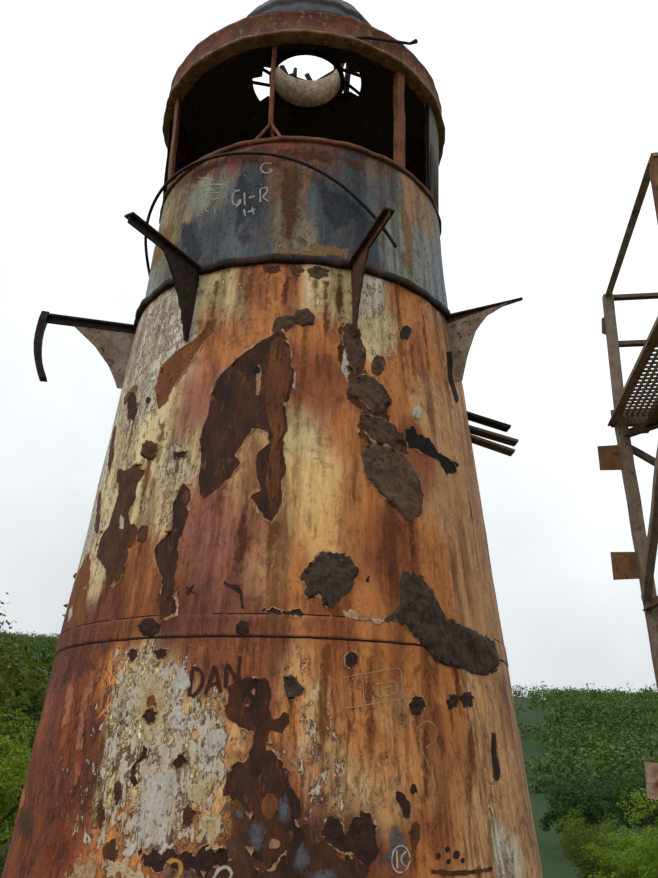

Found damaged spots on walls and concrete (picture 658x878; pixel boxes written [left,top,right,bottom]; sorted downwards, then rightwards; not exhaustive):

rust [191,147,350,258]
rust [397,200,419,268]
rust [323,274,343,332]
peeling [337,322,423,454]
peeling [153,318,296,621]
peeling [62,461,145,630]
rust [234,509,247,563]
peeling [135,647,196,743]
rust [318,645,330,749]
peeling [61,677,379,878]
rust [467,726,475,799]